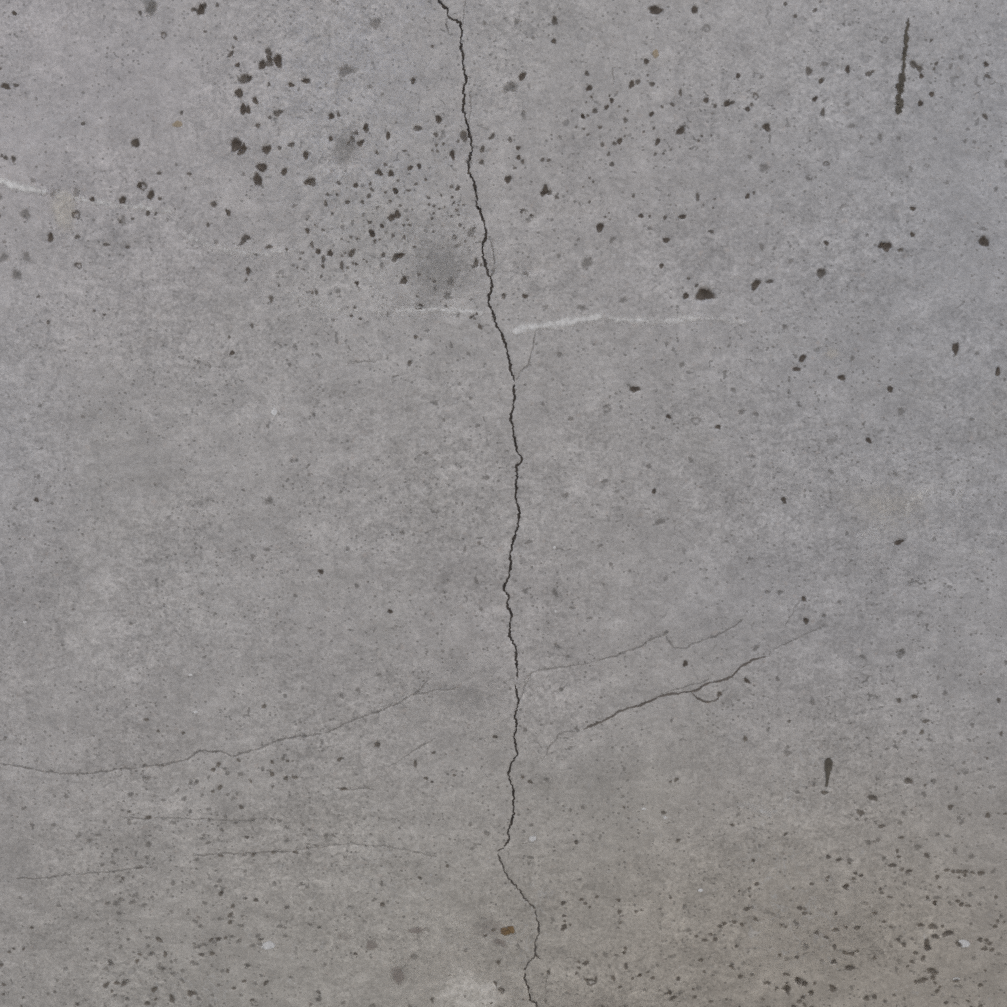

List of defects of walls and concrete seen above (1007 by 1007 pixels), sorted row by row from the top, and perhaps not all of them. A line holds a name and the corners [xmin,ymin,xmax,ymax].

crack [438,0,540,1007]
crack [587,656,765,728]